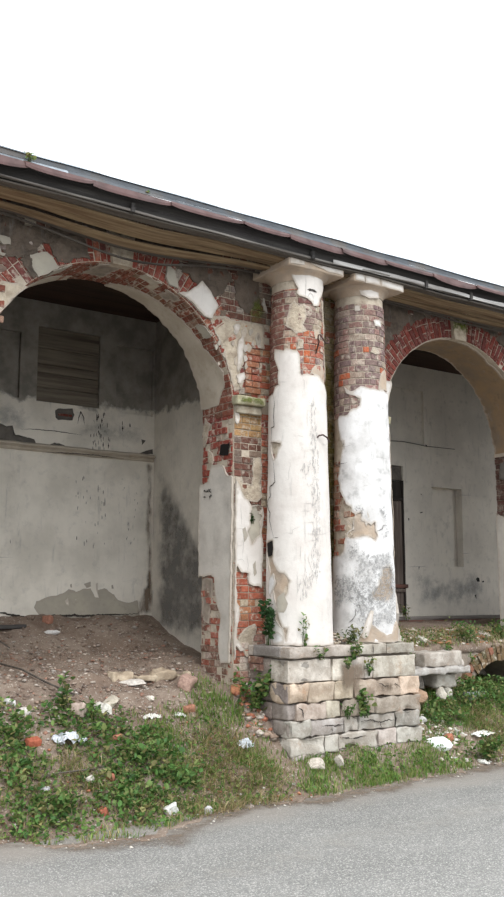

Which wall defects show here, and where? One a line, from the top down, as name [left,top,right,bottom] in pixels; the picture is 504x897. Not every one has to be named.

flaking render [0,198,107,323]
spalling [135,238,445,421]
spalling [0,423,36,443]
flaking render [34,582,140,618]
flaking render [198,411,290,686]
spalling [333,462,377,556]
spalling [373,567,396,600]
crack [325,719,396,739]